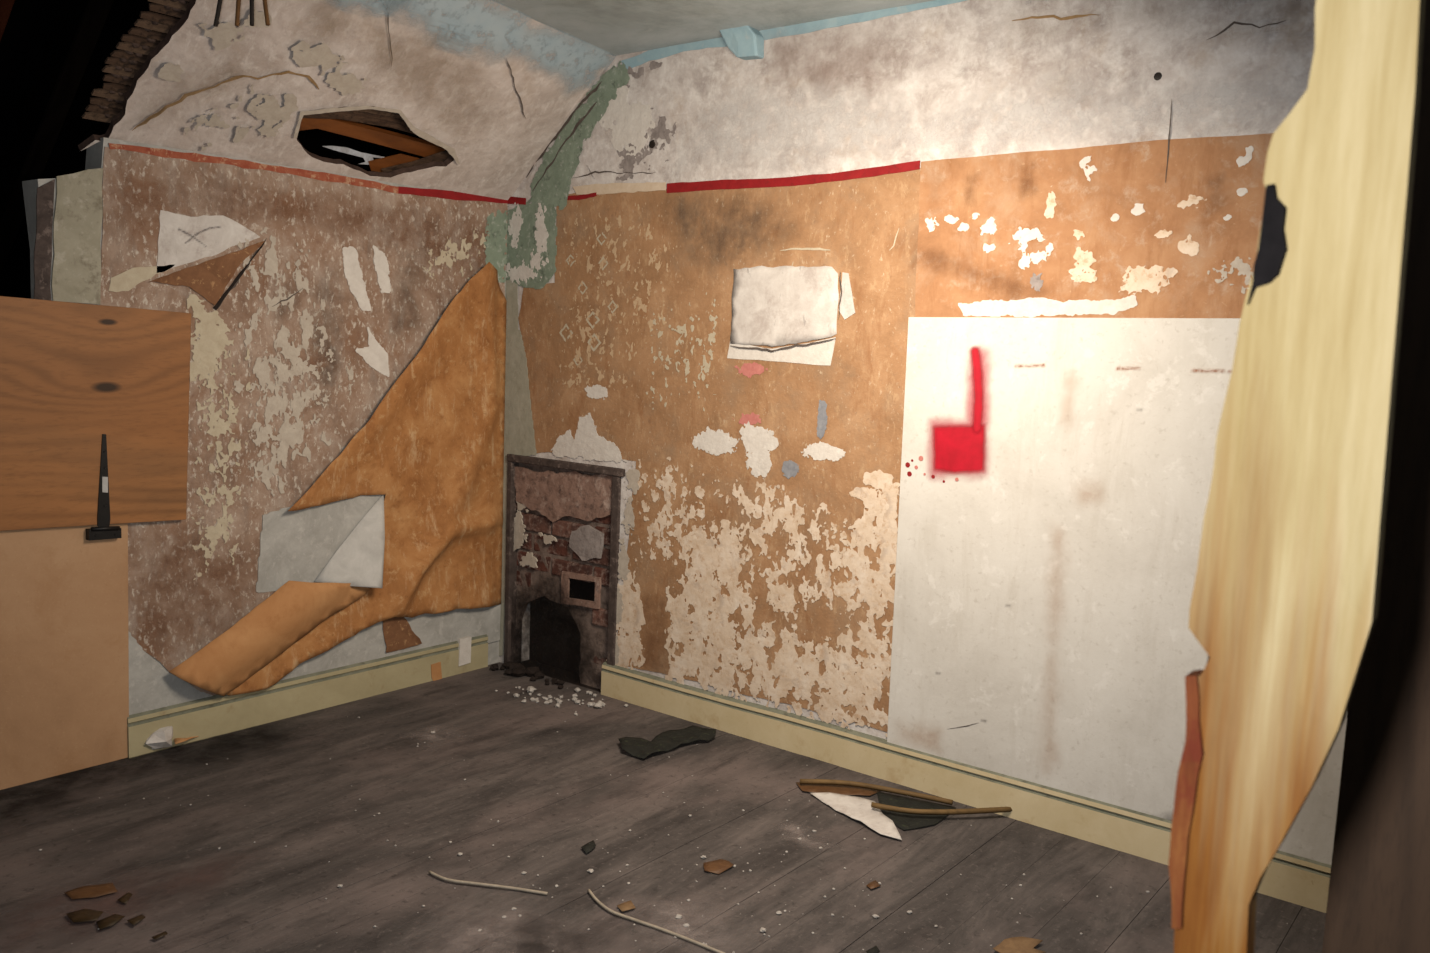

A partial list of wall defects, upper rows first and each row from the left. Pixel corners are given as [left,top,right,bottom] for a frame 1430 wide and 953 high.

crack [1207,20,1286,40]
crack [132,71,319,131]
peeling [1079,155,1097,181]
peeling [1236,146,1254,167]
peeling [1177,194,1207,209]
peeling [925,186,1199,317]
peeling [108,210,391,593]
peeling [281,61,900,737]